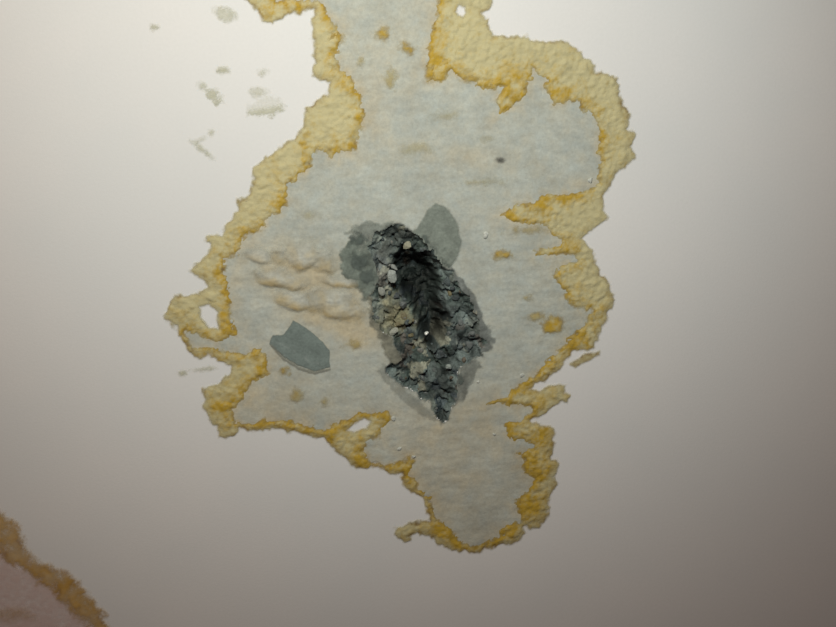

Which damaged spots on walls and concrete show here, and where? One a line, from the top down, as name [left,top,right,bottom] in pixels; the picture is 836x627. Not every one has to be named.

flaking render [270,321,330,374]
water stain [164,0,635,553]
spalling [339,204,495,423]
water stain [0,514,108,627]